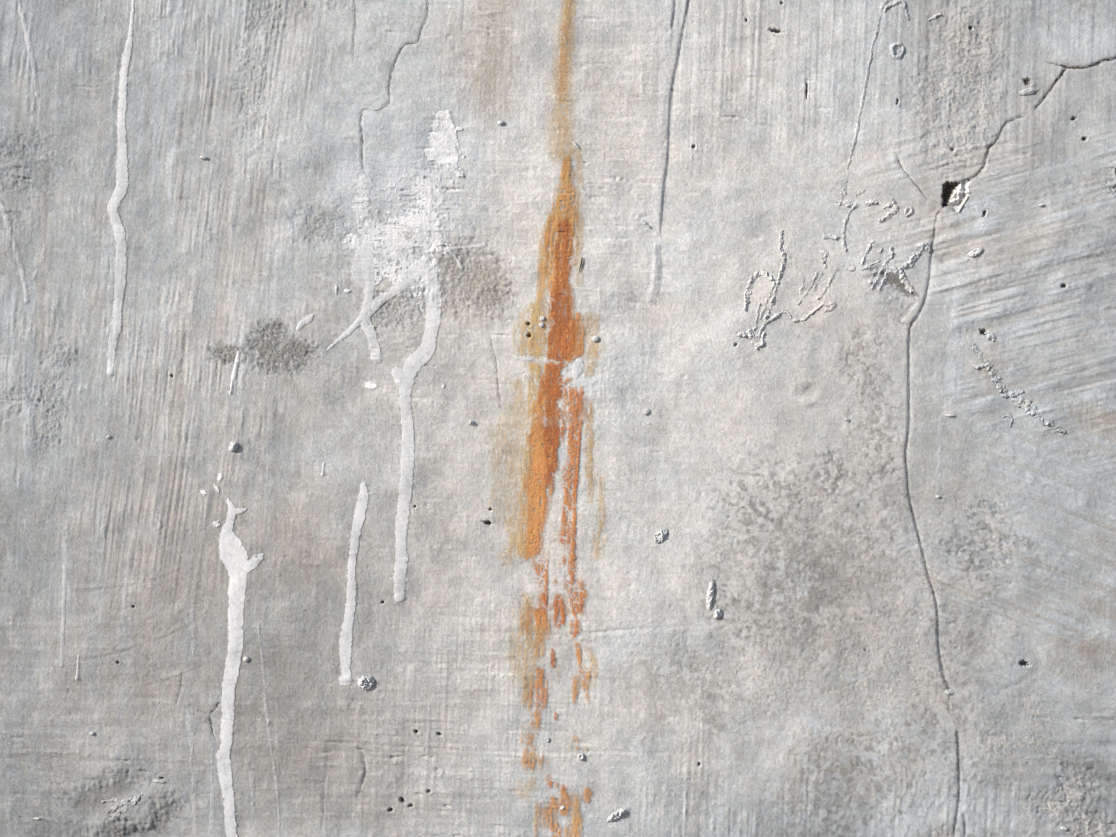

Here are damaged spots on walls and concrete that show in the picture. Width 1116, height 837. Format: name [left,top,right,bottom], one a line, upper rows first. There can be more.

crack [967,57,1116,181]
hole [942,179,970,212]
rust [508,0,593,768]
rust [535,775,591,837]